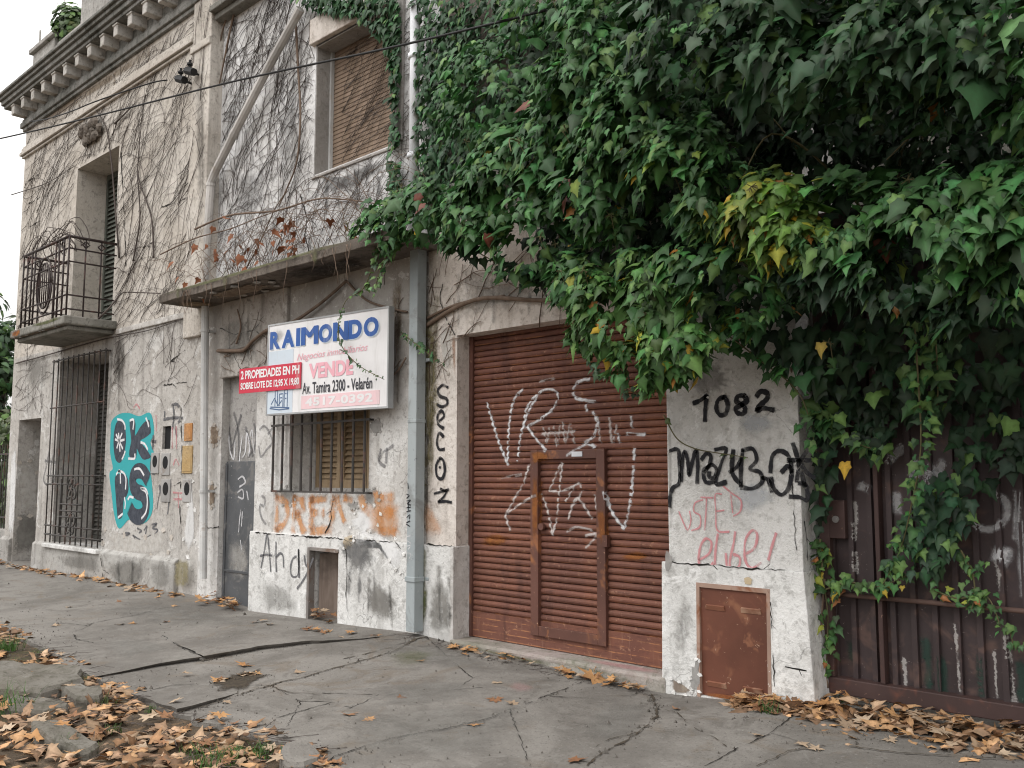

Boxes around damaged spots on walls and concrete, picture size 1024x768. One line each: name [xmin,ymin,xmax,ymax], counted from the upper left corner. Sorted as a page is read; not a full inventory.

crack [672,473,810,571]
leakage [343,543,393,615]
spalling [668,657,702,697]